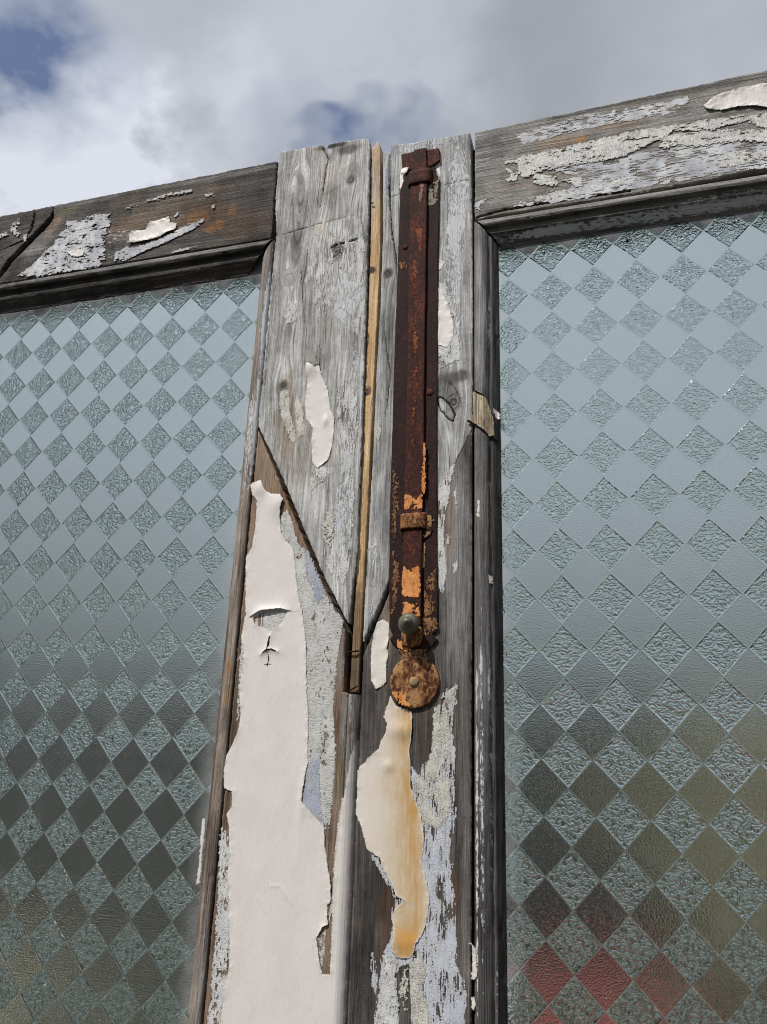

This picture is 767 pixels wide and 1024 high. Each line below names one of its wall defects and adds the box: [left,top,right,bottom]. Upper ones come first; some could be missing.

crack [5,214,54,272]
peeling [129,216,177,243]
rust [399,228,426,353]
rust [419,178,439,206]
peeling [504,83,767,207]
peeling [305,348,342,468]
rust [391,439,438,636]
peeling [220,480,457,1024]